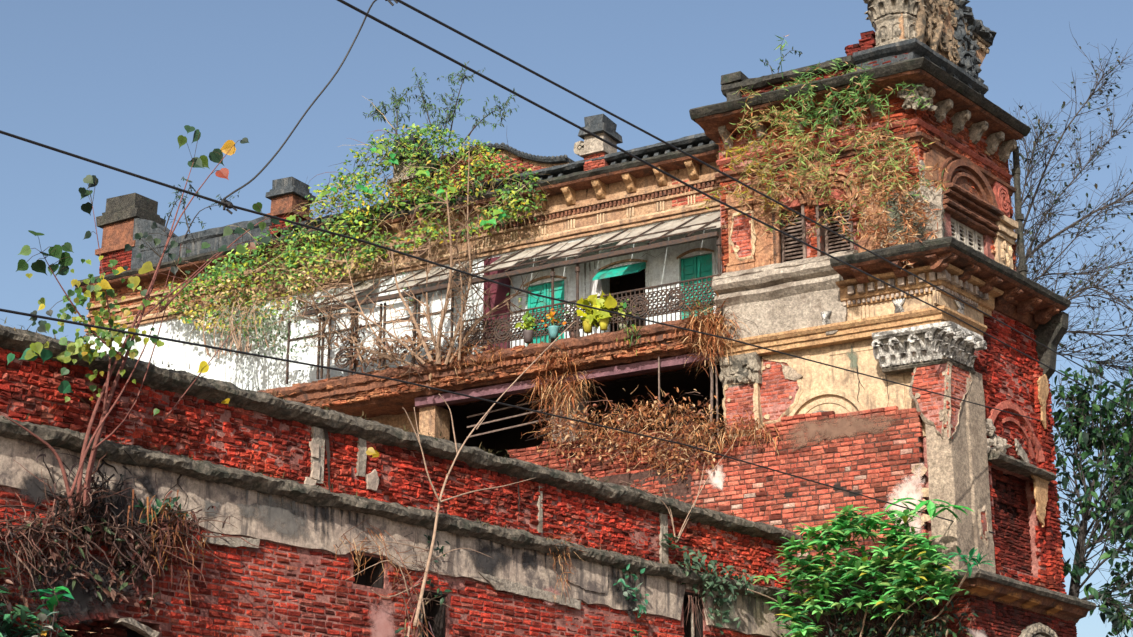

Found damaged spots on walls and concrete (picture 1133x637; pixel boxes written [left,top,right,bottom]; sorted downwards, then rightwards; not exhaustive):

spalling [266,327,718,408]
spalling [722,356,804,435]
spalling [909,357,973,440]
peeling [1037,374,1049,429]
damp [20,473,56,503]
spalling [0,347,791,610]
peeling [992,433,1050,527]
damp [468,538,557,576]